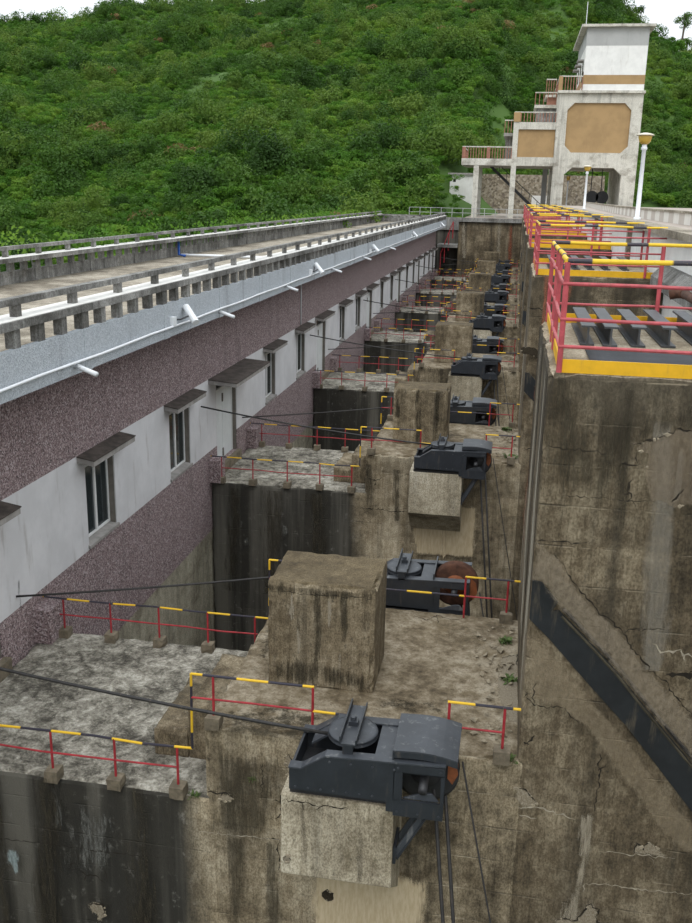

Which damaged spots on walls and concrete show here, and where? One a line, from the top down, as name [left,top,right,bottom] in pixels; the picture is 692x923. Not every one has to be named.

water stain [519,326,634,691]
crack [539,539,692,714]
crack [524,683,578,722]
crack [594,755,606,811]
crack [520,806,573,819]
spalling [633,842,664,856]
water stain [0,850,19,923]
spalling [89,902,107,921]
spalling [322,889,334,902]
spalling [552,904,601,923]